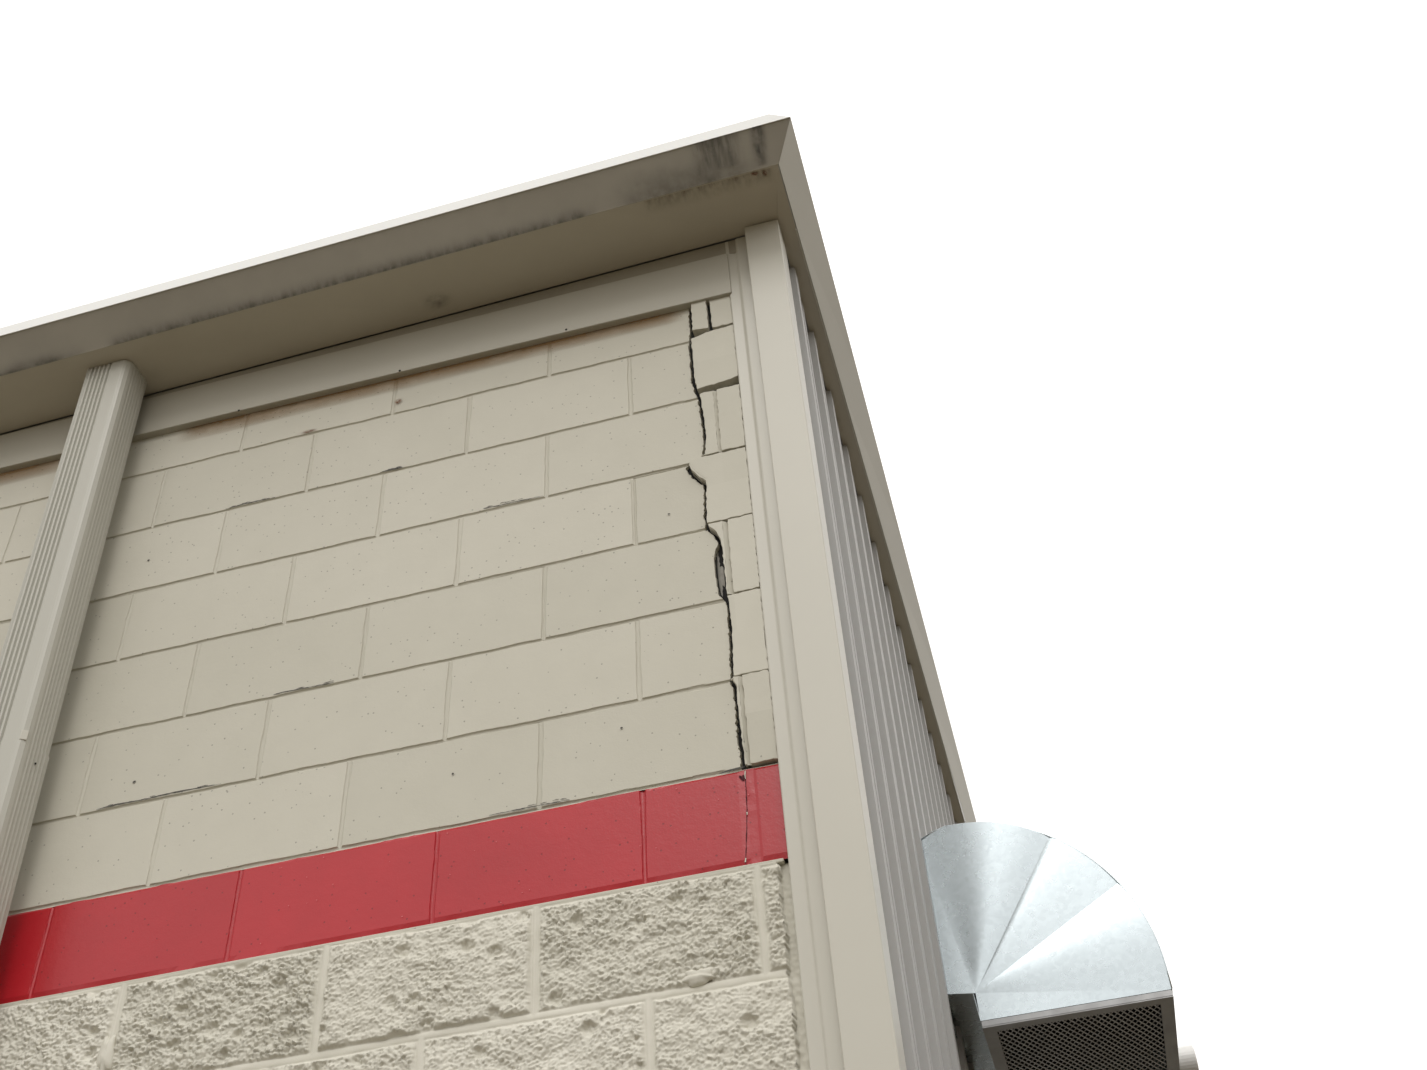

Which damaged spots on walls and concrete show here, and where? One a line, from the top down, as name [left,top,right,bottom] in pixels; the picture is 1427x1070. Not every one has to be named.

crack [688,305,748,864]